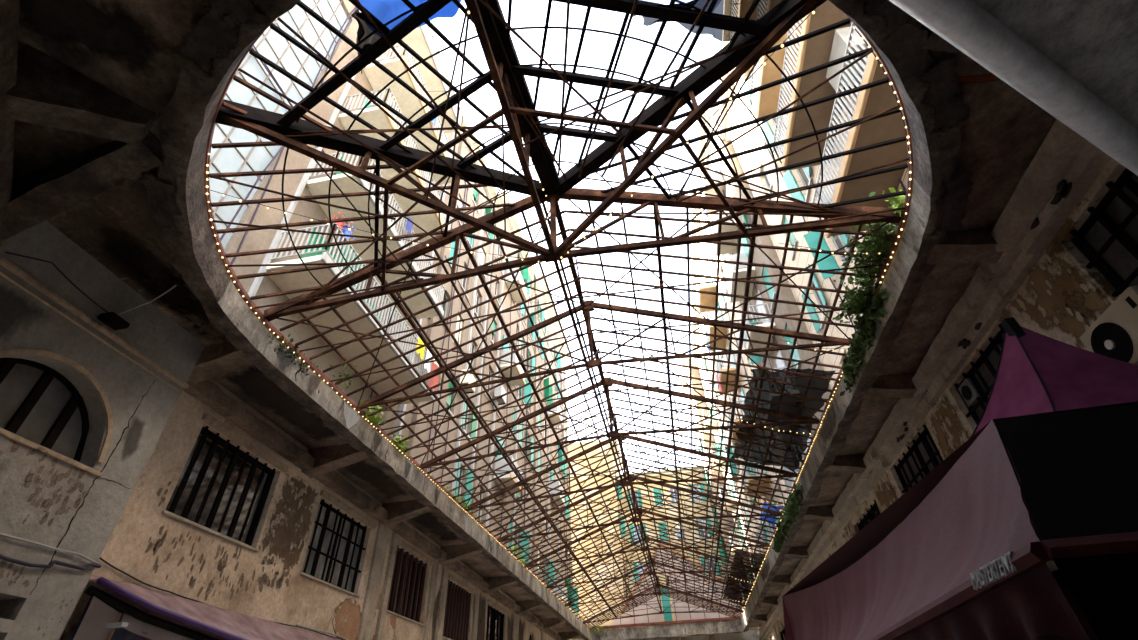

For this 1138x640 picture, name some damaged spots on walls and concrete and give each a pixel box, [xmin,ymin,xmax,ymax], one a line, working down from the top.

peeling [1008,238,1110,338]
peeling [931,394,970,459]
peeling [145,474,318,601]